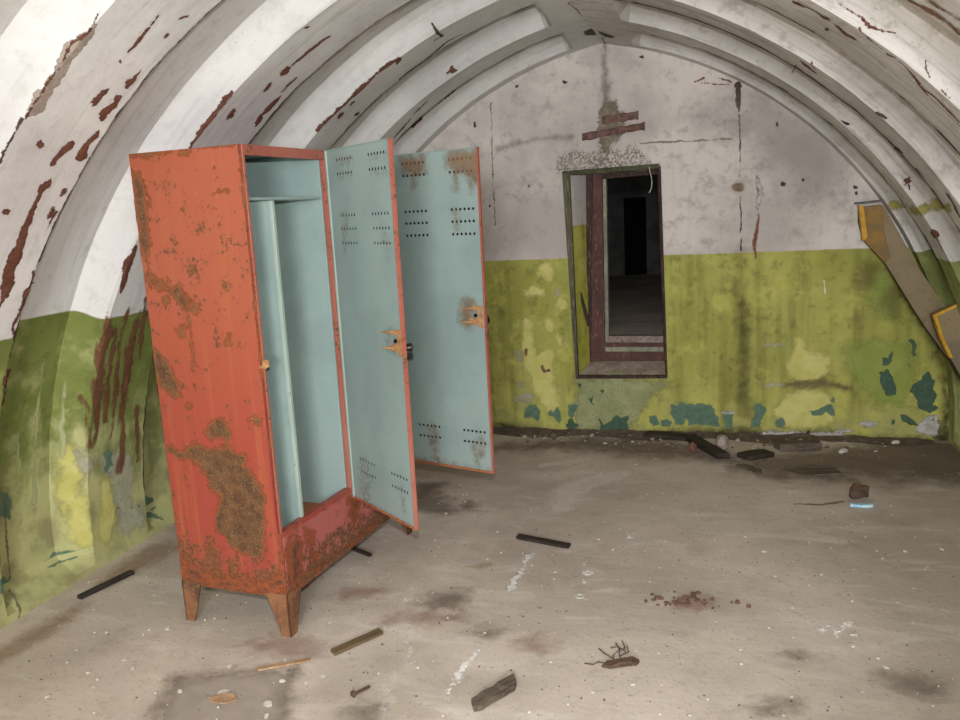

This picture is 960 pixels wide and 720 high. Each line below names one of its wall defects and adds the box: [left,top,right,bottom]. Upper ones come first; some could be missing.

spalling [792,1,856,40]
spalling [25,24,97,119]
spalling [557,100,649,170]
crack [618,0,960,293]
corrosion [752,175,764,259]
spalling [11,270,35,339]
corrosion [78,297,148,475]
peeling [649,402,734,430]
peeling [879,352,896,396]
peeling [891,414,918,426]
peeling [910,372,938,413]